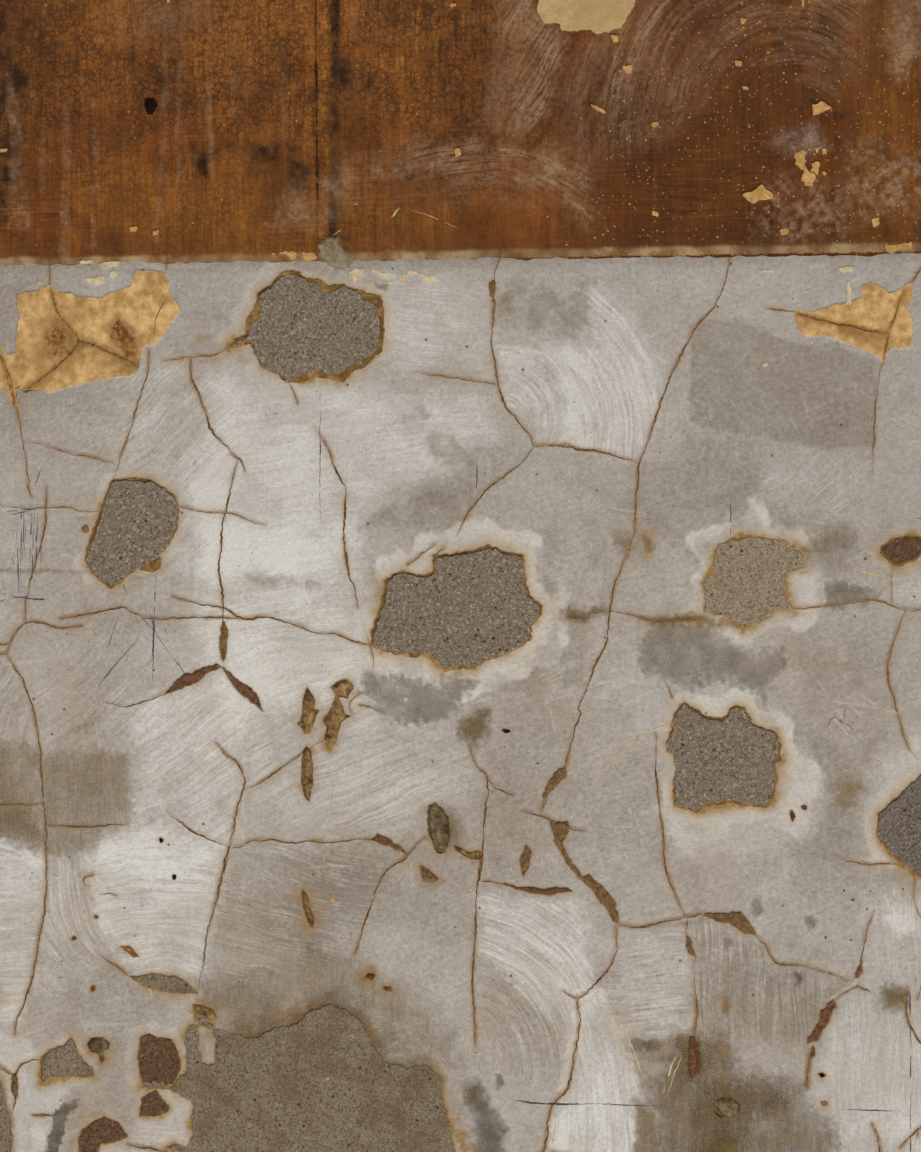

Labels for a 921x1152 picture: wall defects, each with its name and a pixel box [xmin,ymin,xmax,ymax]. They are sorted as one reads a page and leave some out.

peeling [537,0,635,42]
peeling [0,260,180,407]
flaking render [231,271,385,383]
crack [0,347,374,1032]
flaking render [371,545,542,672]
crack [407,249,874,1152]
flaking render [666,704,781,813]
crack [794,567,921,759]
crack [170,741,424,989]
crack [0,1059,56,1116]
flaking render [131,974,455,1152]
leakage [637,1034,831,1152]